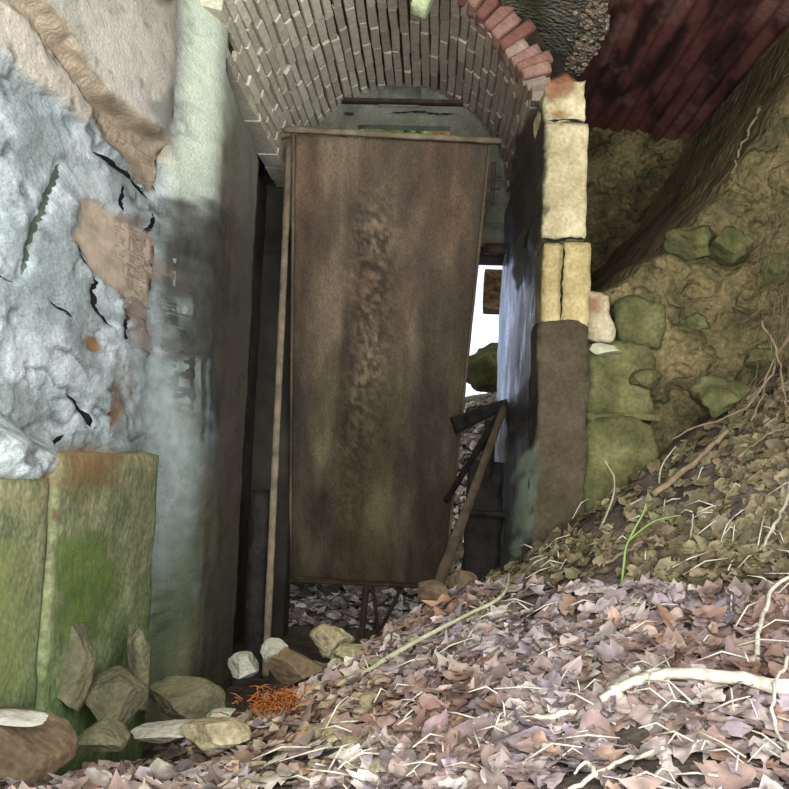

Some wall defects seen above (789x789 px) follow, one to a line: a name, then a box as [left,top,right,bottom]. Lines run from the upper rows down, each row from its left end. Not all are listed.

spalling [8,0,167,189]
crack [0,164,59,282]
crack [74,239,151,357]
peeling [73,199,154,306]
water stain [165,179,233,408]
water stain [507,108,550,297]
crack [541,237,586,319]
crack [67,394,92,427]
water stain [505,379,535,442]